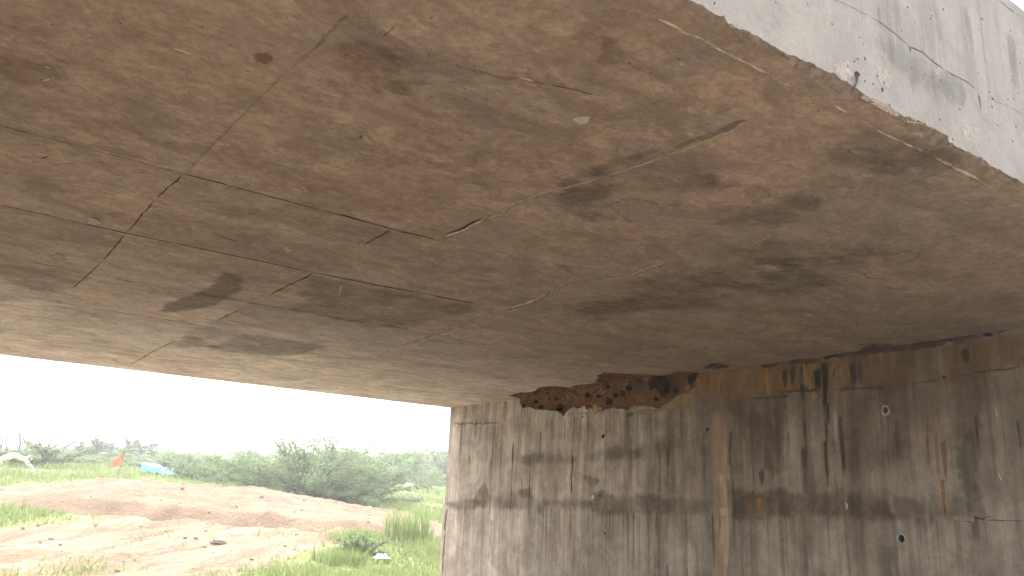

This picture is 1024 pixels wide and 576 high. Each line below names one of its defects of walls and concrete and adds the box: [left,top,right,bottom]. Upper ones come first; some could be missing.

crack [836,0,971,85]
crack [447,119,754,236]
spalling [509,372,700,417]